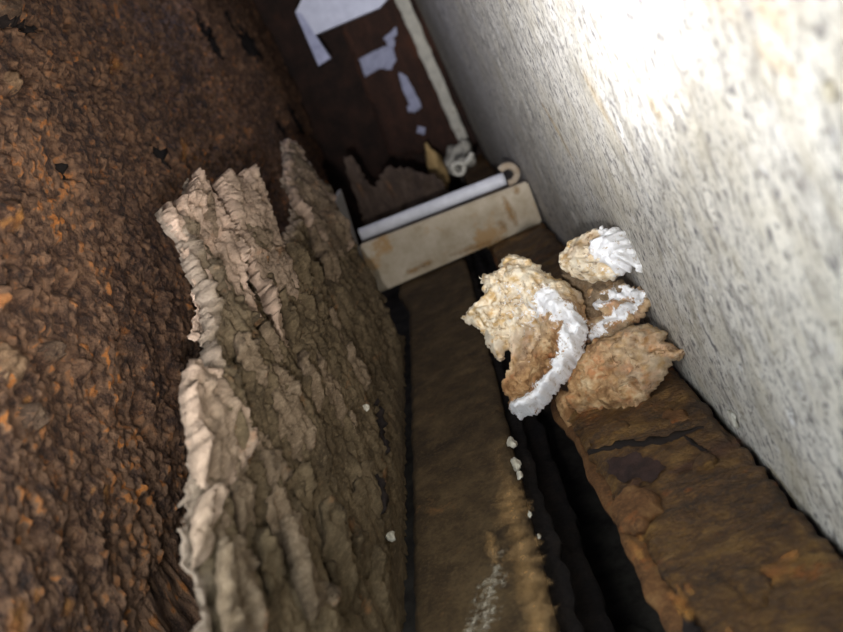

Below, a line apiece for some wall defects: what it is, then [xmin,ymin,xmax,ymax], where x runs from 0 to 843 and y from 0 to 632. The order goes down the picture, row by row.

rust [0,0,22,27]
peeling [359,27,422,113]
rust [3,71,24,99]
spalling [152,147,175,173]
rust [0,342,29,385]
rust [154,138,409,632]
crack [587,426,711,455]